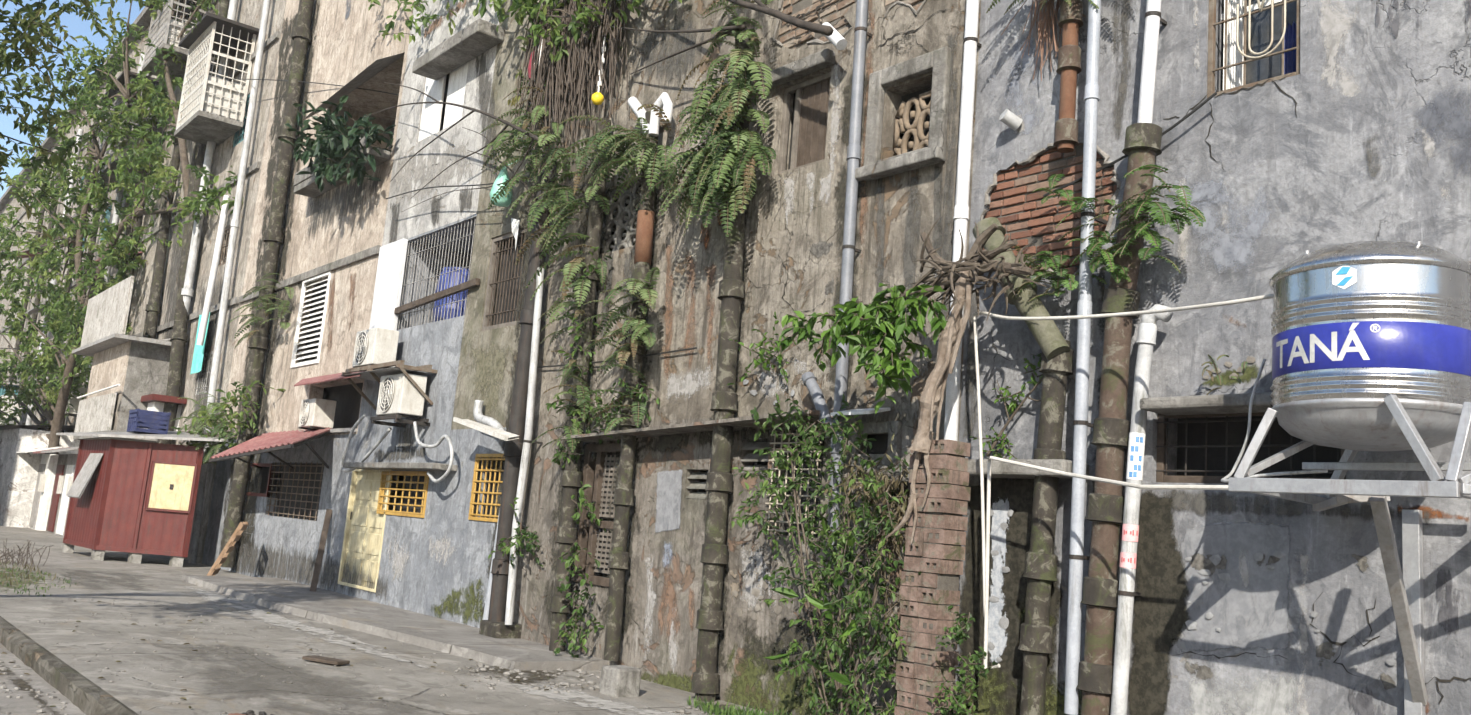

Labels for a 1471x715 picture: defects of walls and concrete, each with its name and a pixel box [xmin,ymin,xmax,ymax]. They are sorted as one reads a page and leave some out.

flaking render [773,0,856,49]
flaking render [884,0,927,18]
crack [1166,74,1297,170]
flaking render [980,143,1121,279]
water stain [736,211,747,389]
water stain [544,161,722,644]
water stain [733,413,824,443]
peeling [988,497,1014,663]
water stain [669,621,677,671]
crack [1310,592,1380,677]
crack [1425,676,1471,704]